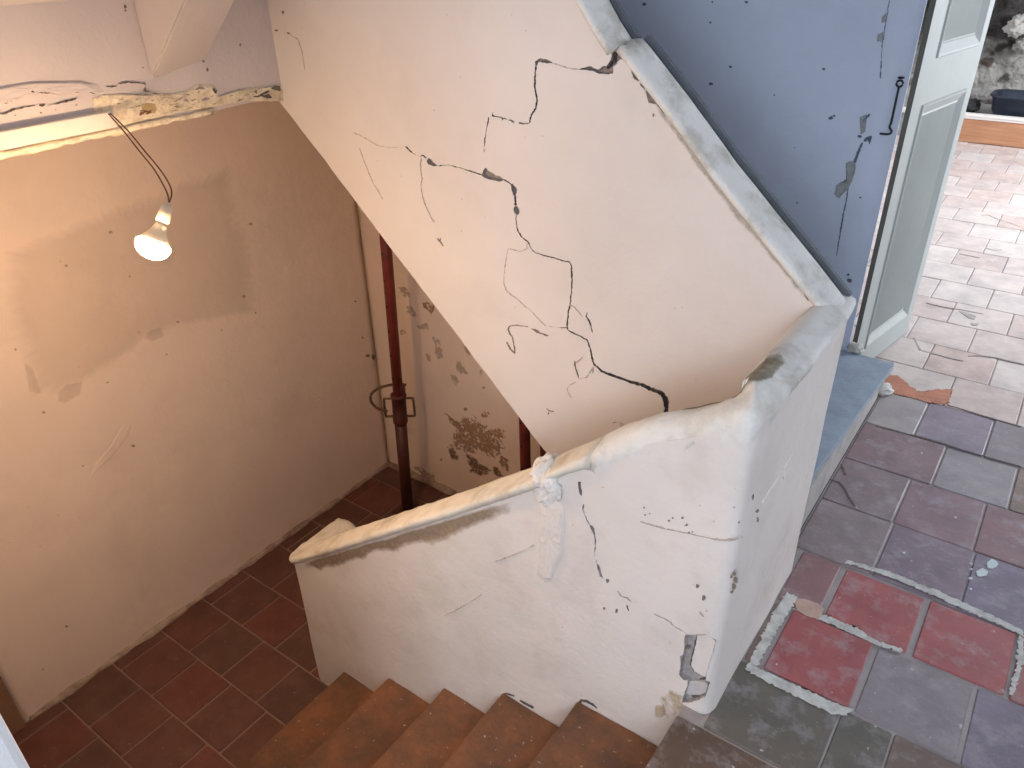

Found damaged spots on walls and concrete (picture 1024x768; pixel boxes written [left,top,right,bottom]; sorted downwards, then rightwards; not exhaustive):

crack [877,0,890,78]
crack [1,98,76,115]
crack [106,81,157,94]
flaking render [0,60,284,160]
peeling [834,162,855,198]
crack [854,142,863,163]
peeling [857,114,872,144]
crack [354,52,669,415]
crack [836,189,848,256]
crack [578,482,631,613]
crack [640,507,742,542]
flaking render [679,634,716,703]